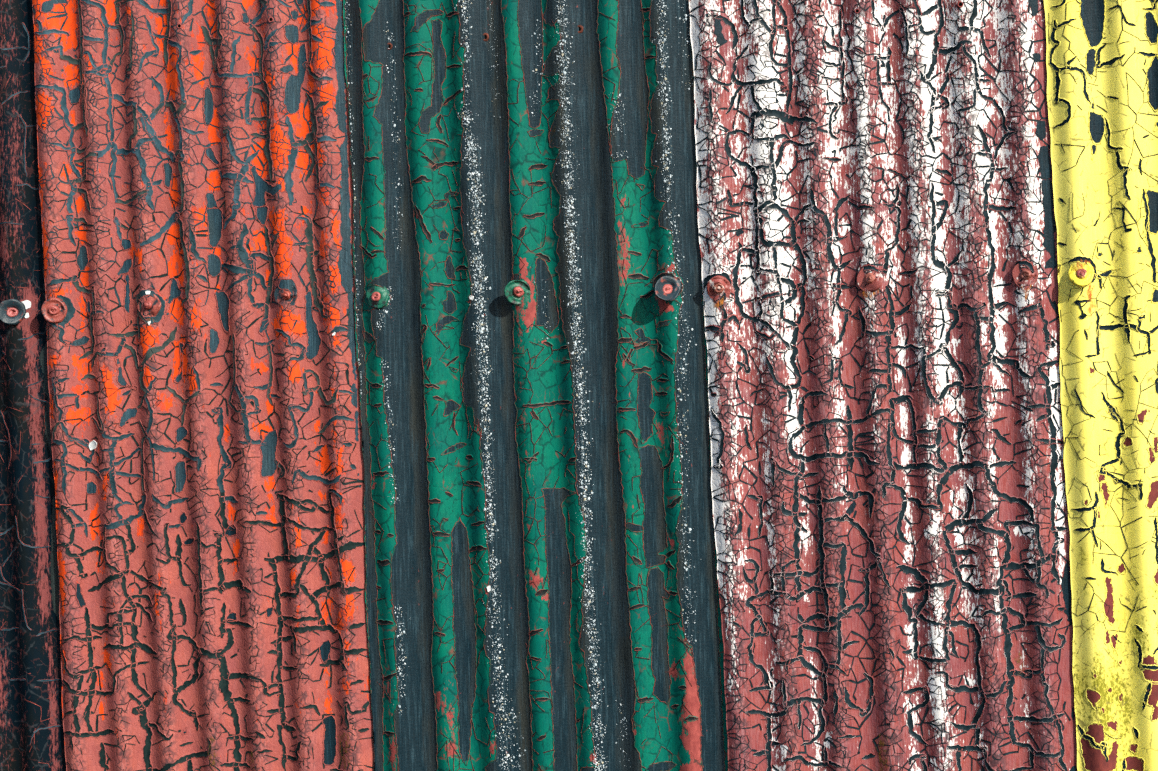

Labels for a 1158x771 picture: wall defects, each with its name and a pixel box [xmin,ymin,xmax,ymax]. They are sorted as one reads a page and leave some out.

peeling [32,0,92,130]
crack [598,0,656,143]
peeling [1079,0,1106,78]
peeling [1144,11,1158,132]
crack [505,77,560,281]
peeling [1036,121,1062,275]
peeling [39,52,230,622]
crack [0,0,499,771]
peeling [244,0,726,771]
crack [611,0,1158,771]
crack [526,628,593,771]
peeling [1070,669,1145,771]